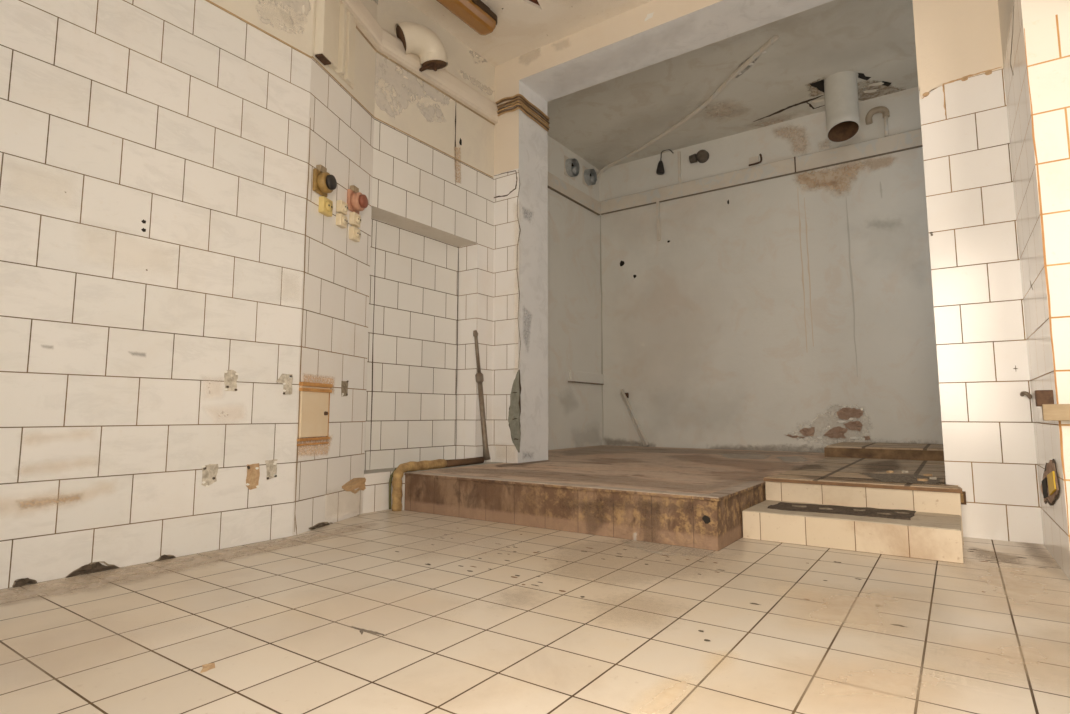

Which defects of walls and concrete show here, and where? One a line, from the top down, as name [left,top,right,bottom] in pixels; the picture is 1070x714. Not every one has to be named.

spalling [224,370,238,391]
spalling [276,374,293,395]
spalling [341,381,349,396]
peeling [786,406,871,445]
spalling [202,464,218,487]
spalling [246,459,277,490]
spalling [342,478,366,494]